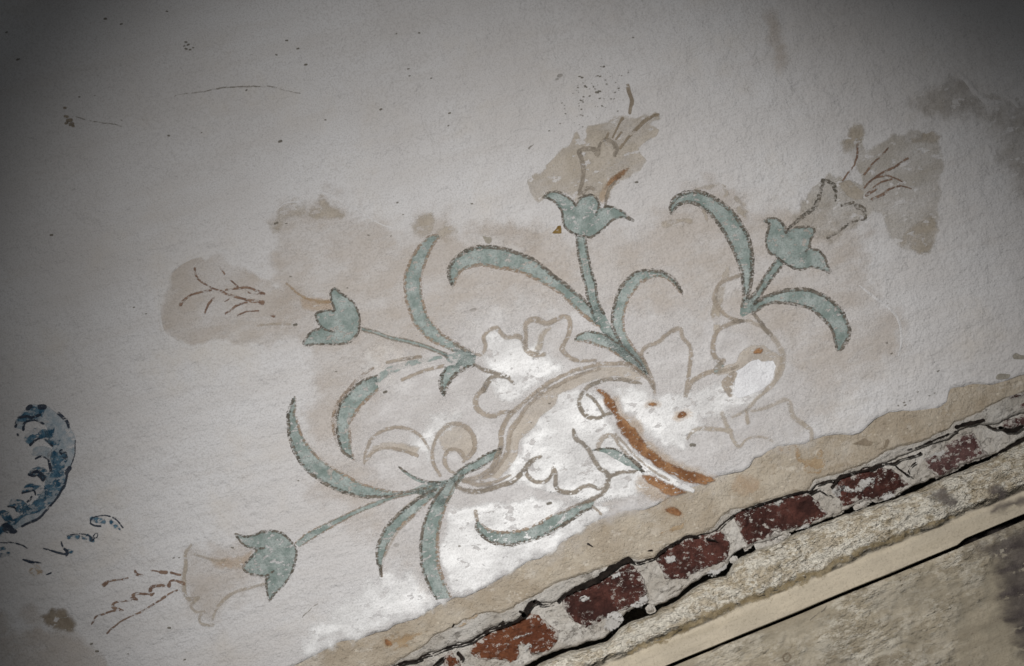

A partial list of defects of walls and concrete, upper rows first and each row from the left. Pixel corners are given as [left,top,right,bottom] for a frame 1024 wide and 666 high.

damp [532,113,659,203]
flaking render [294,296,1024,666]
crack [398,419,1024,666]